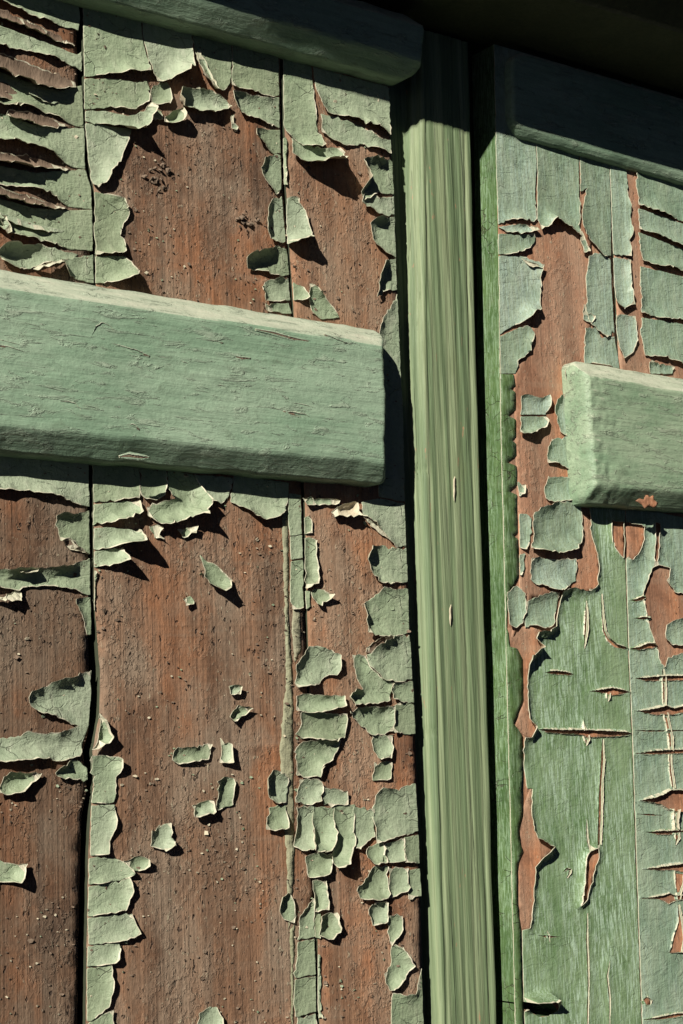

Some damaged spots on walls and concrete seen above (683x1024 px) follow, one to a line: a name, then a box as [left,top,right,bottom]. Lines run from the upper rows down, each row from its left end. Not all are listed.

peeling [493,44,683,737]
peeling [0,0,424,1024]
crack [538,594,683,954]
peeling [518,788,553,931]
peeling [582,849,599,905]
crack [585,914,611,1024]
crack [641,996,683,1021]